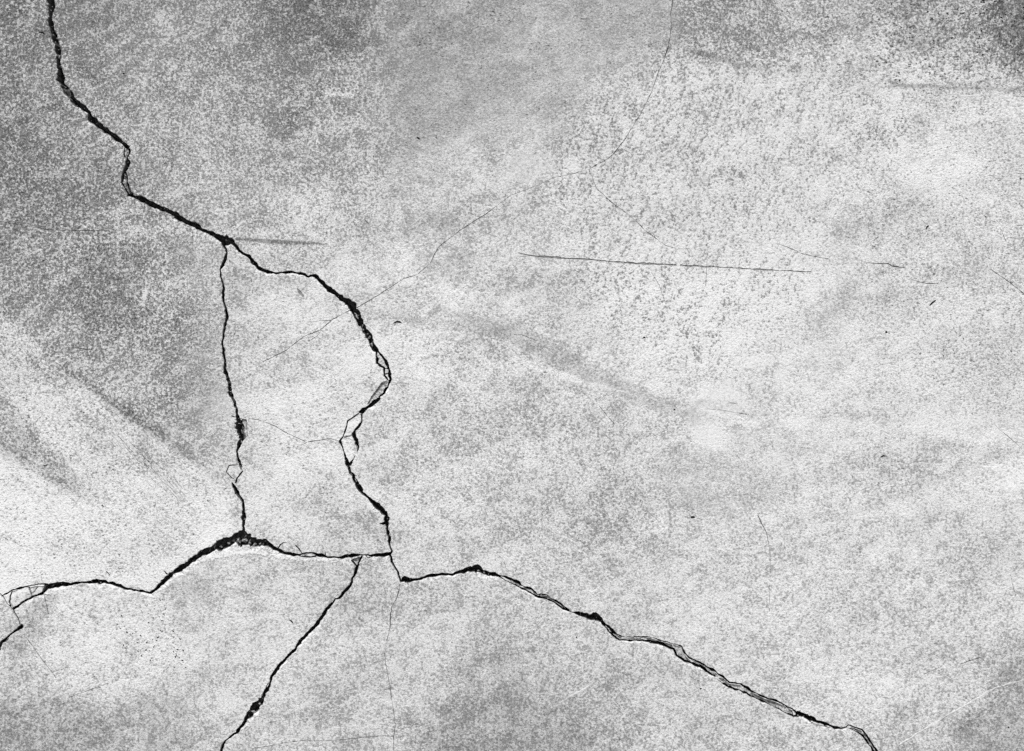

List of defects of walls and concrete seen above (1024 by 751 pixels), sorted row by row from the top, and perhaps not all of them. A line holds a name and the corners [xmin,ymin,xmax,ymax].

crack [430,201,503,263]
crack [507,28,708,251]
crack [518,244,827,301]
crack [0,0,427,751]
crack [400,564,878,751]